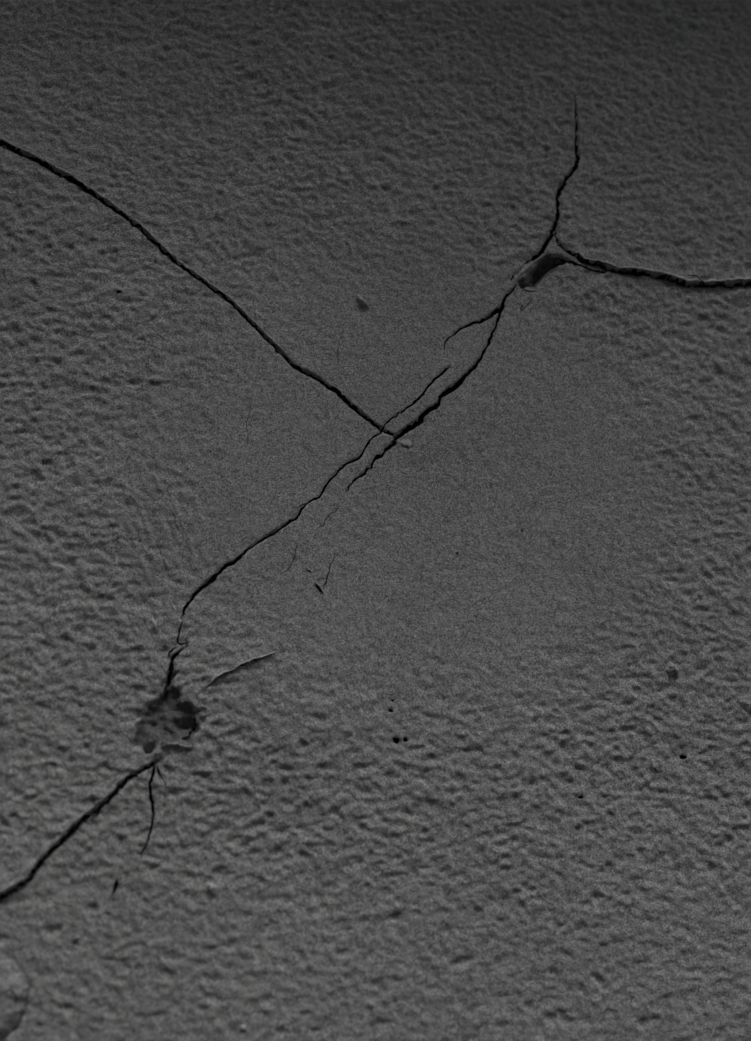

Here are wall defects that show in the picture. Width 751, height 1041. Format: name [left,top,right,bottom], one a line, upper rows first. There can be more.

crack [0,97,751,696]
crack [0,760,167,903]